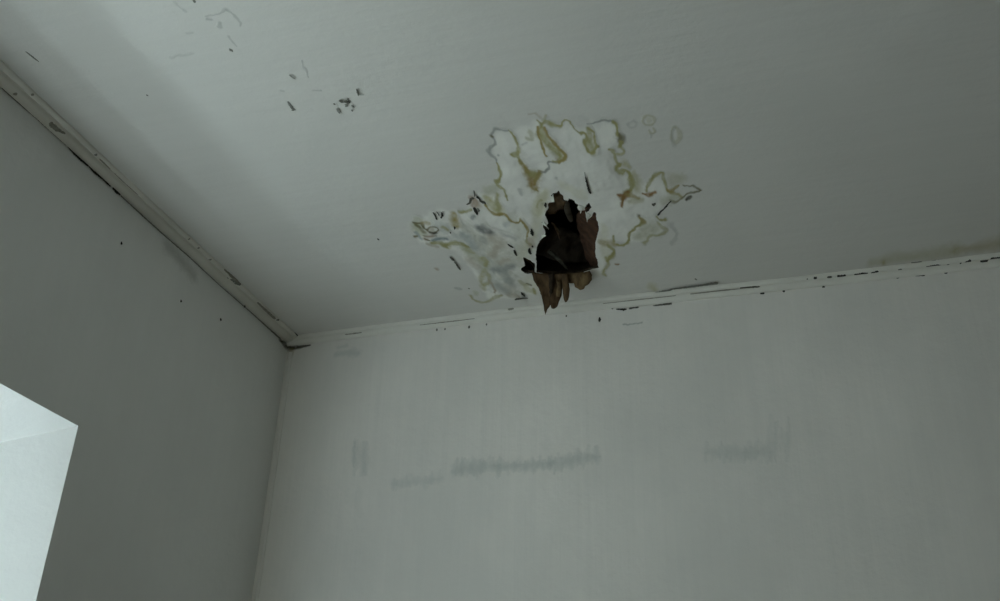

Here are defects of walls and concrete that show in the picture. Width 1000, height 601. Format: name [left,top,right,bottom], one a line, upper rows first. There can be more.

water stain [404,111,703,304]
spalling [545,199,590,234]
spalling [522,254,591,272]